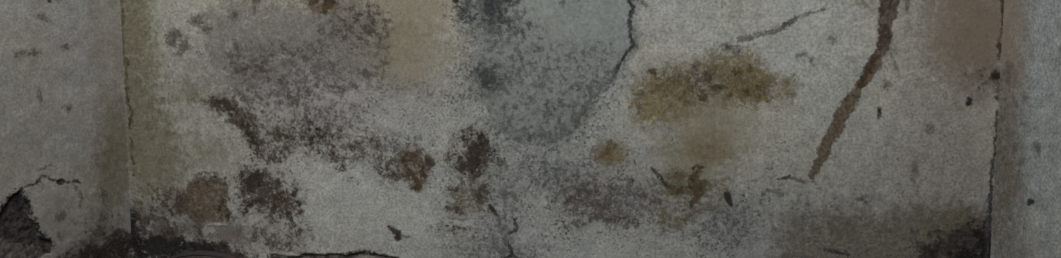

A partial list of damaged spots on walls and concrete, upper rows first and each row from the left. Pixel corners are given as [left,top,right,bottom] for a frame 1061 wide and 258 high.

spalling [0,188,66,258]
leakage [59,0,392,258]
mould [443,0,529,46]
crack [500,241,518,258]
mould [428,64,662,258]
crack [573,0,647,125]
crack [737,7,824,42]
corrosion [808,0,910,179]
leakage [777,99,1023,258]